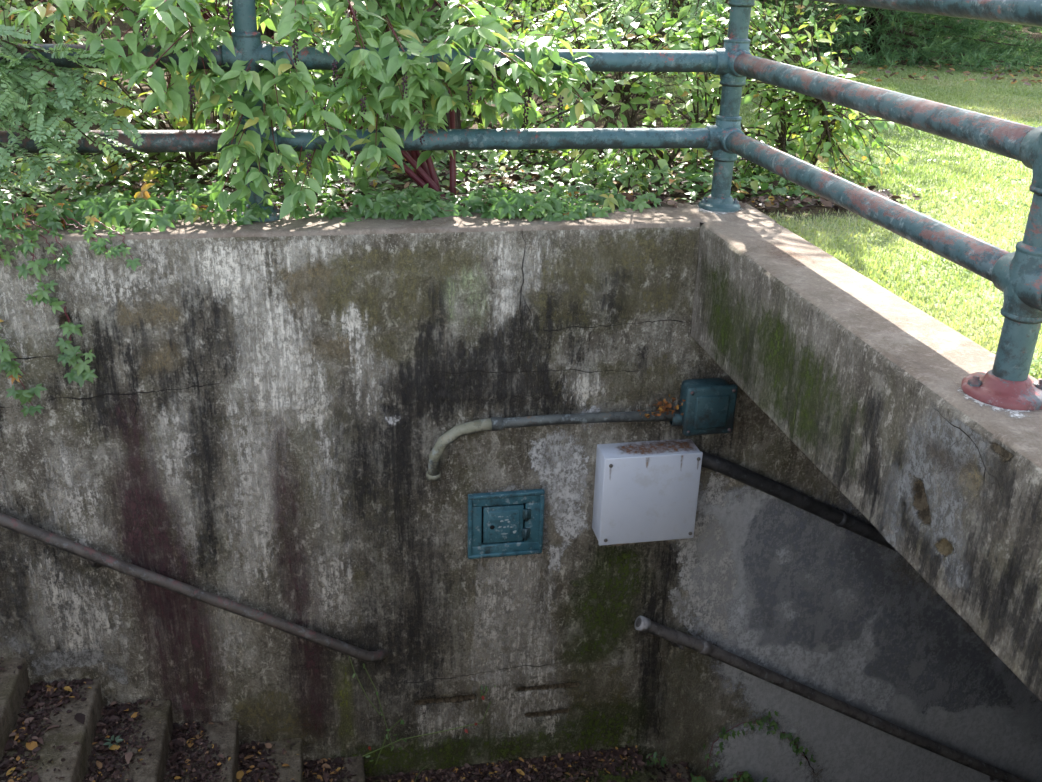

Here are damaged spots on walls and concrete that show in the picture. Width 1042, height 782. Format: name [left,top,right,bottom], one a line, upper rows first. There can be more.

water stain [0,251,52,358]
water stain [3,445,128,669]
crack [50,383,219,416]
corrosion [113,405,223,724]
water stain [307,542,363,625]
water stain [71,231,697,592]
water stain [466,554,565,737]
peeling [668,472,897,712]
water stain [589,446,1042,782]
spalling [912,479,932,526]
spalling [934,537,954,557]
crack [932,406,1005,501]